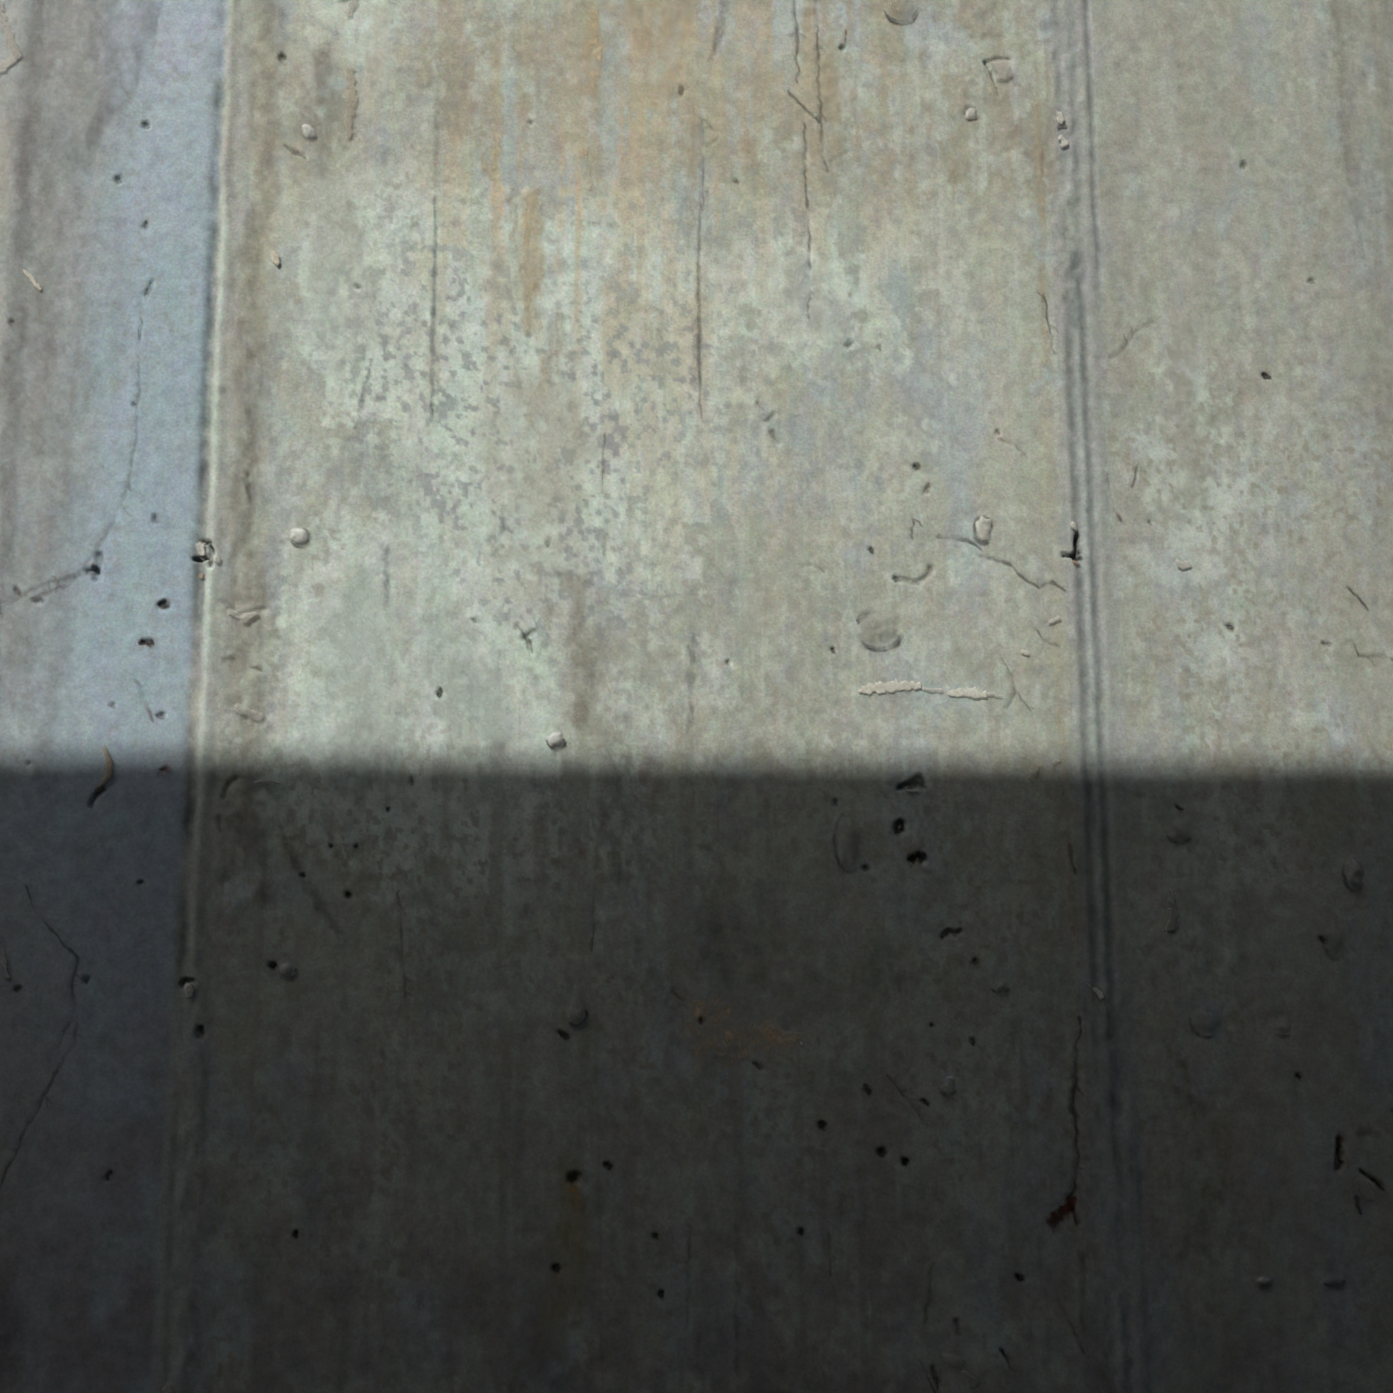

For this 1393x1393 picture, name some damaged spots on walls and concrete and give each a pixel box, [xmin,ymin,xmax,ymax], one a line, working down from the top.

crack [1070,1080,1080,1193]
corrosion [1047,1197,1077,1225]